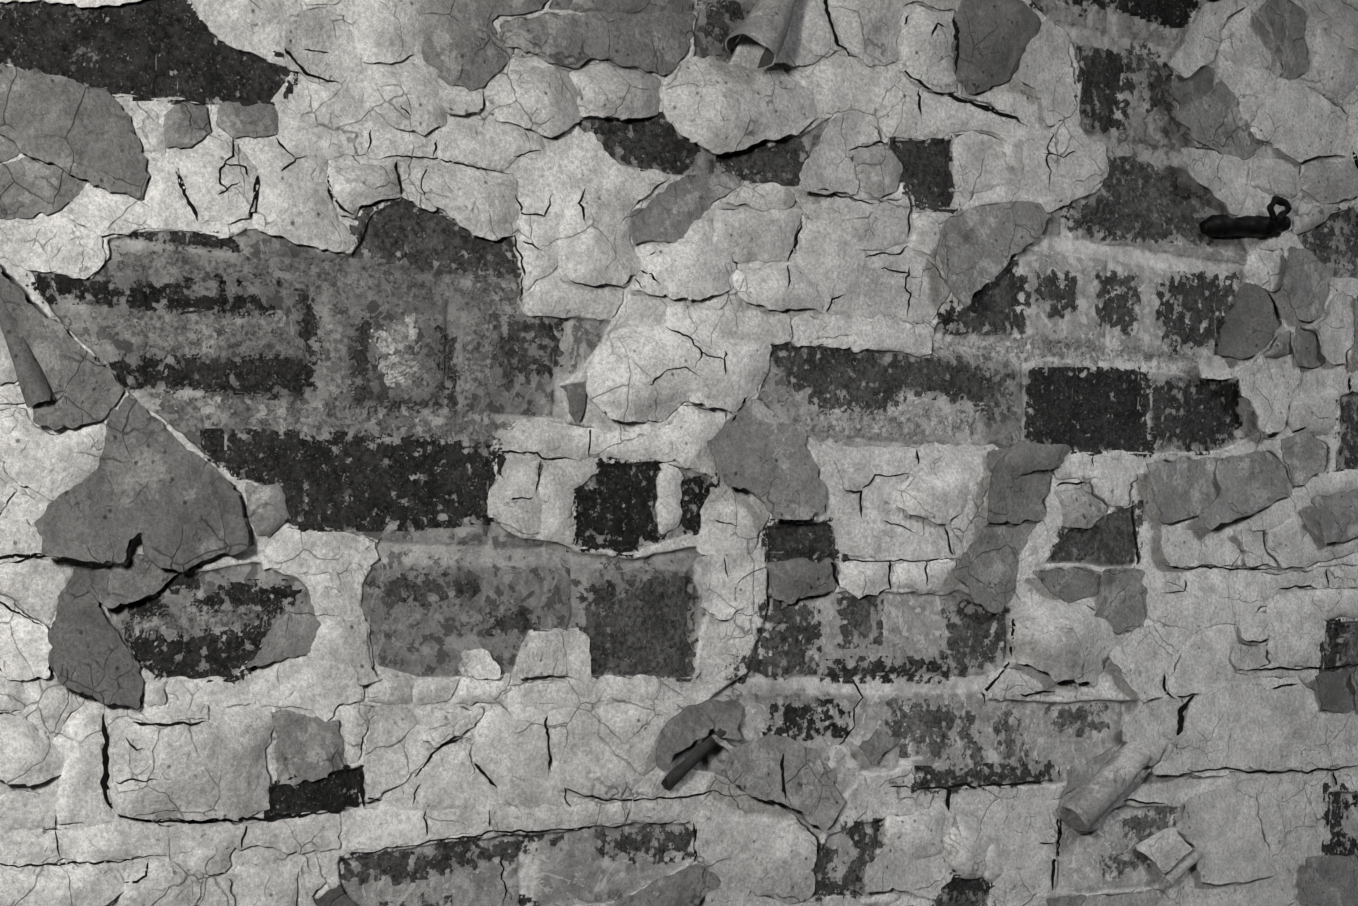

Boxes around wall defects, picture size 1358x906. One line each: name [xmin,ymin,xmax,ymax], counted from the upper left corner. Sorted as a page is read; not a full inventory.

crack [823,0,856,57]
crack [904,14,1075,192]
crack [367,130,586,308]
flaking render [0,0,1358,424]
crack [865,208,912,315]
crack [650,327,748,421]
crack [499,429,591,500]
crack [831,450,953,590]
crack [0,827,164,883]
crack [100,714,750,904]
crack [890,780,1053,811]
crack [1040,819,1062,890]